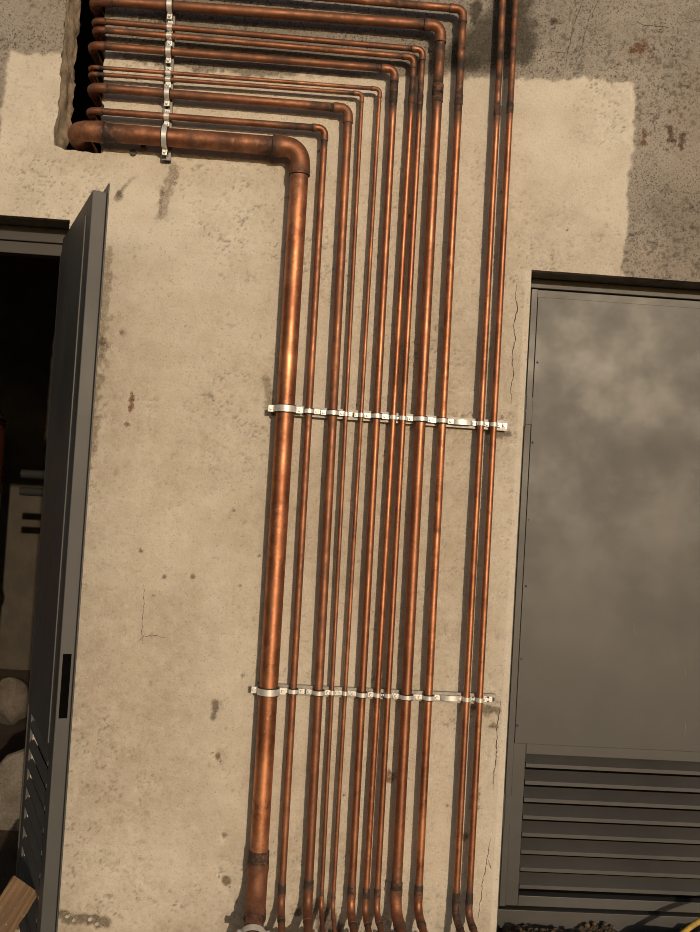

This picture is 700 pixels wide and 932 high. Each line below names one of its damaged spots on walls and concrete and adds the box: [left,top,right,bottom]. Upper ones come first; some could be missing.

water stain [449,0,535,68]
crack [510,285,518,400]